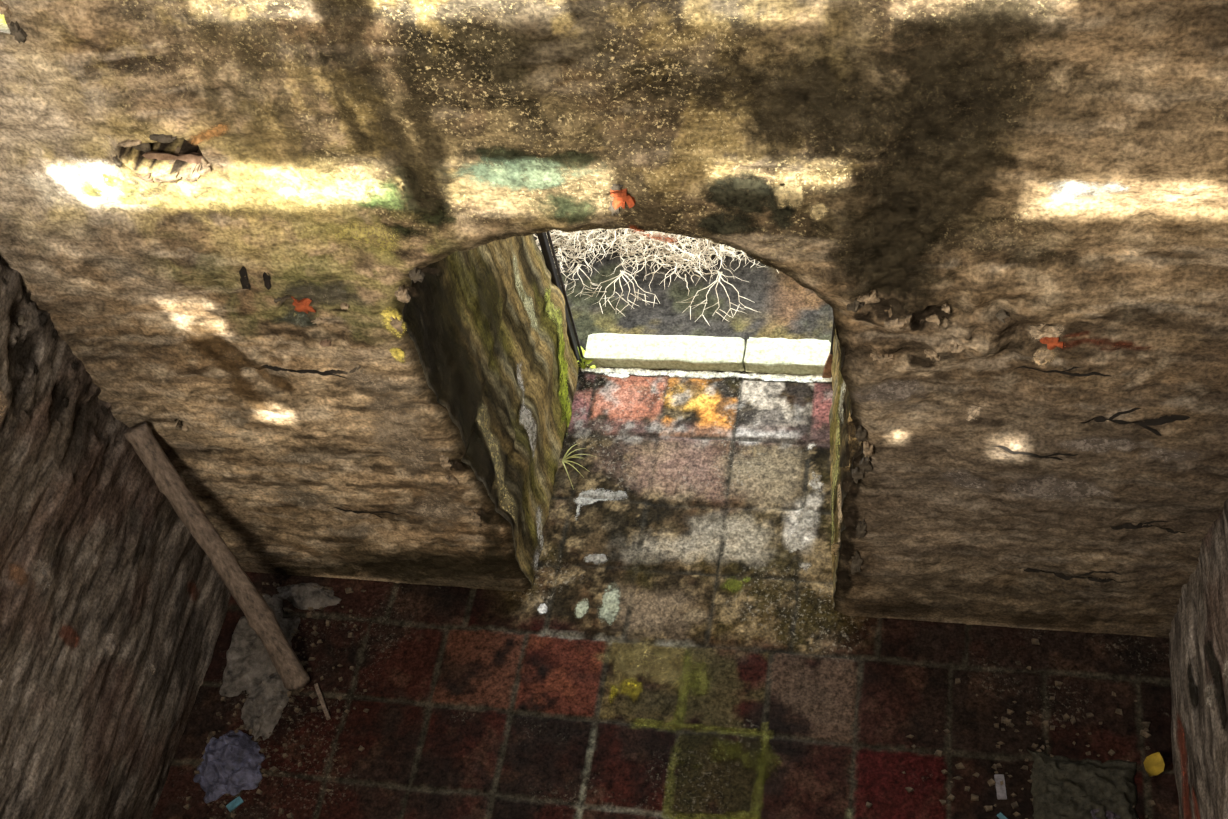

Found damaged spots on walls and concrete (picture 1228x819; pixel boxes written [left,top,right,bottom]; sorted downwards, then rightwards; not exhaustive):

spalling [113,124,228,184]